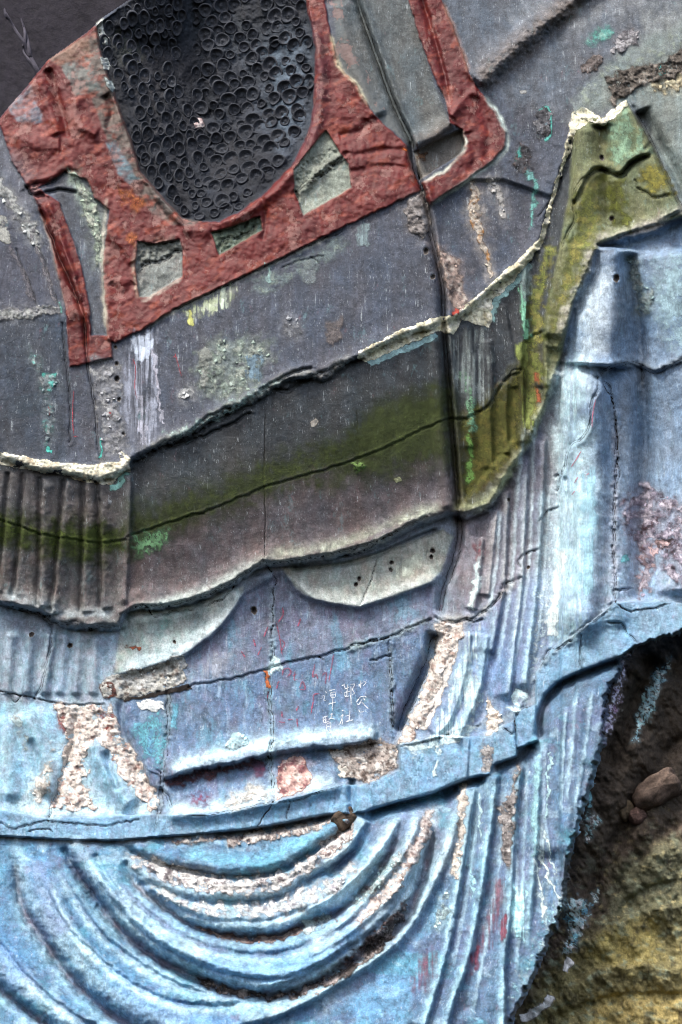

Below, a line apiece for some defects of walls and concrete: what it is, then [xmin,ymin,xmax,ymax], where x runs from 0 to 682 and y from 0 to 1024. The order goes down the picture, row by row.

spalling [580,29,682,107]
spalling [403,191,431,238]
crack [540,360,681,668]
spalling [620,482,682,600]
spalling [32,655,192,812]
spalling [220,756,312,810]
spalling [328,621,464,784]
spalling [496,764,521,869]
spalling [131,818,358,944]
spalling [197,810,434,1003]